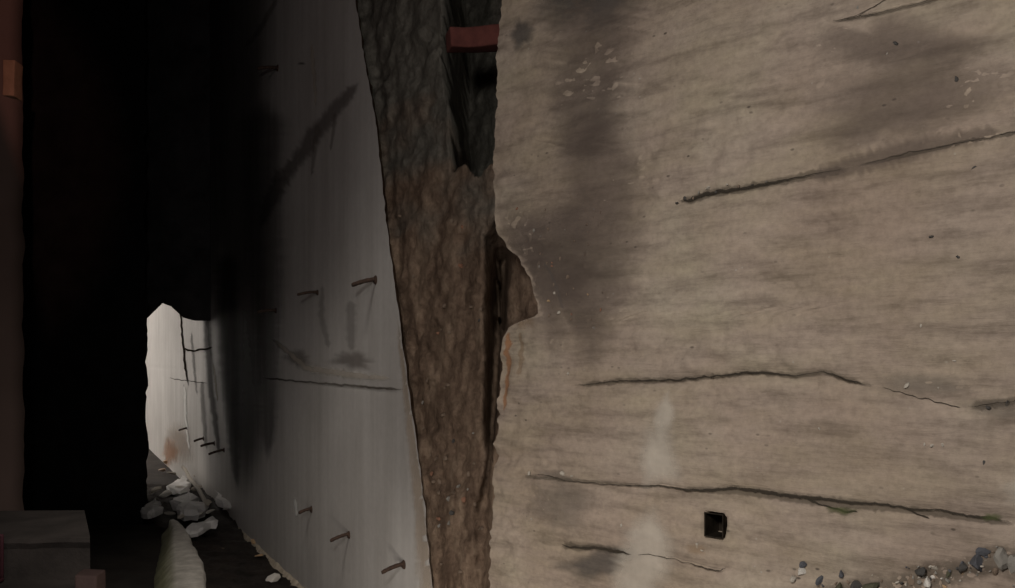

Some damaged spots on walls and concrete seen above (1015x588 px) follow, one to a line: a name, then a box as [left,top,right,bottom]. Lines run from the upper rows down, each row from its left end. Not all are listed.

crack [833,0,928,21]
crack [865,132,1008,164]
crack [675,169,840,204]
leakage [205,261,239,480]
crack [580,371,1014,407]
crack [538,474,1009,522]
crack [562,544,723,571]